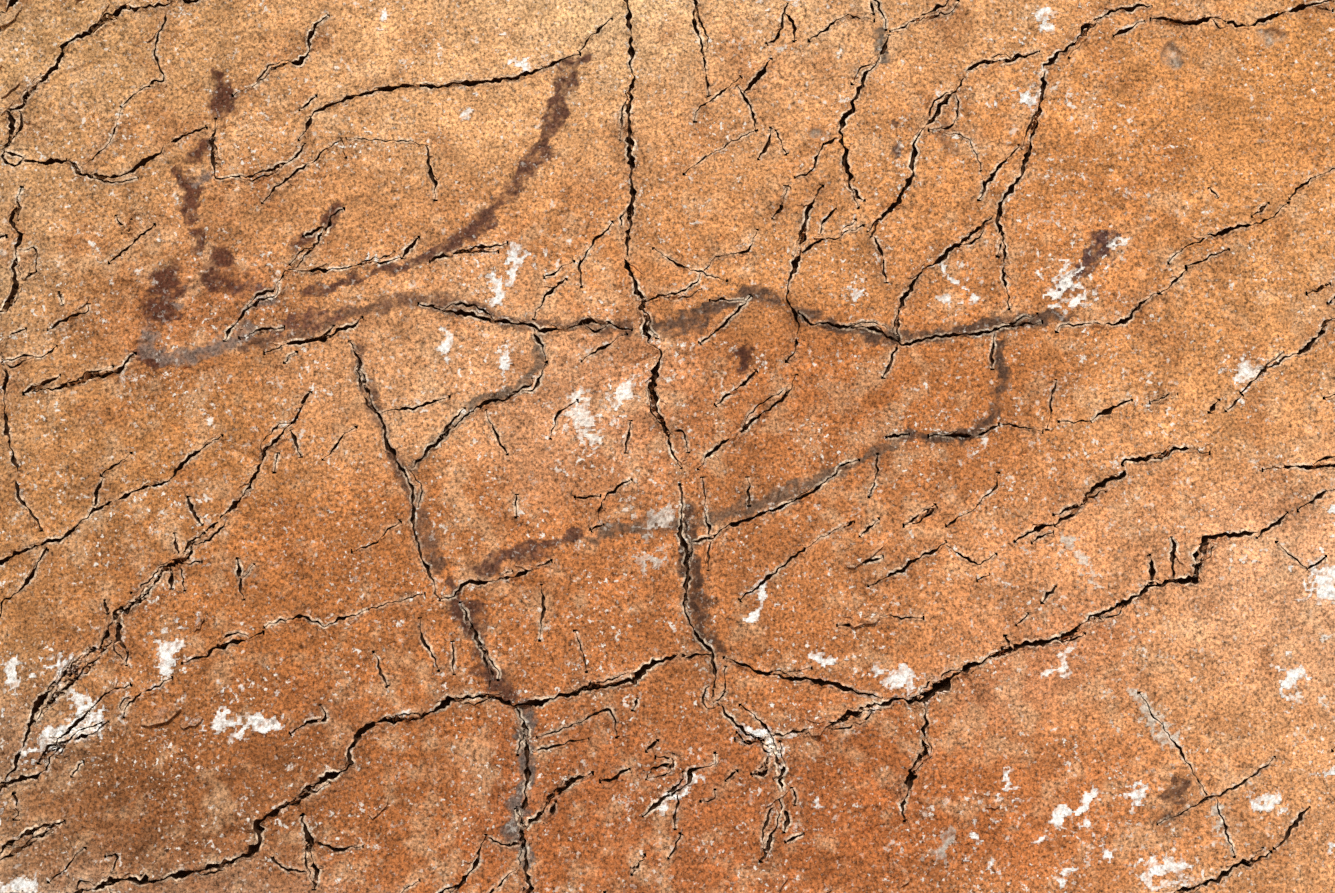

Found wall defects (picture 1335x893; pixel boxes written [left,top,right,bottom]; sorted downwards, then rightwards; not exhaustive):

crack [0,188,222,621]
crack [0,0,612,204]
crack [223,203,420,364]
crack [348,0,760,602]
crack [683,0,789,176]
crack [696,374,799,470]
crack [767,0,1335,378]
crack [929,380,1178,441]
crack [1014,441,1214,544]
crack [1208,281,1335,414]
crack [0,391,312,864]
crack [59,455,1311,893]